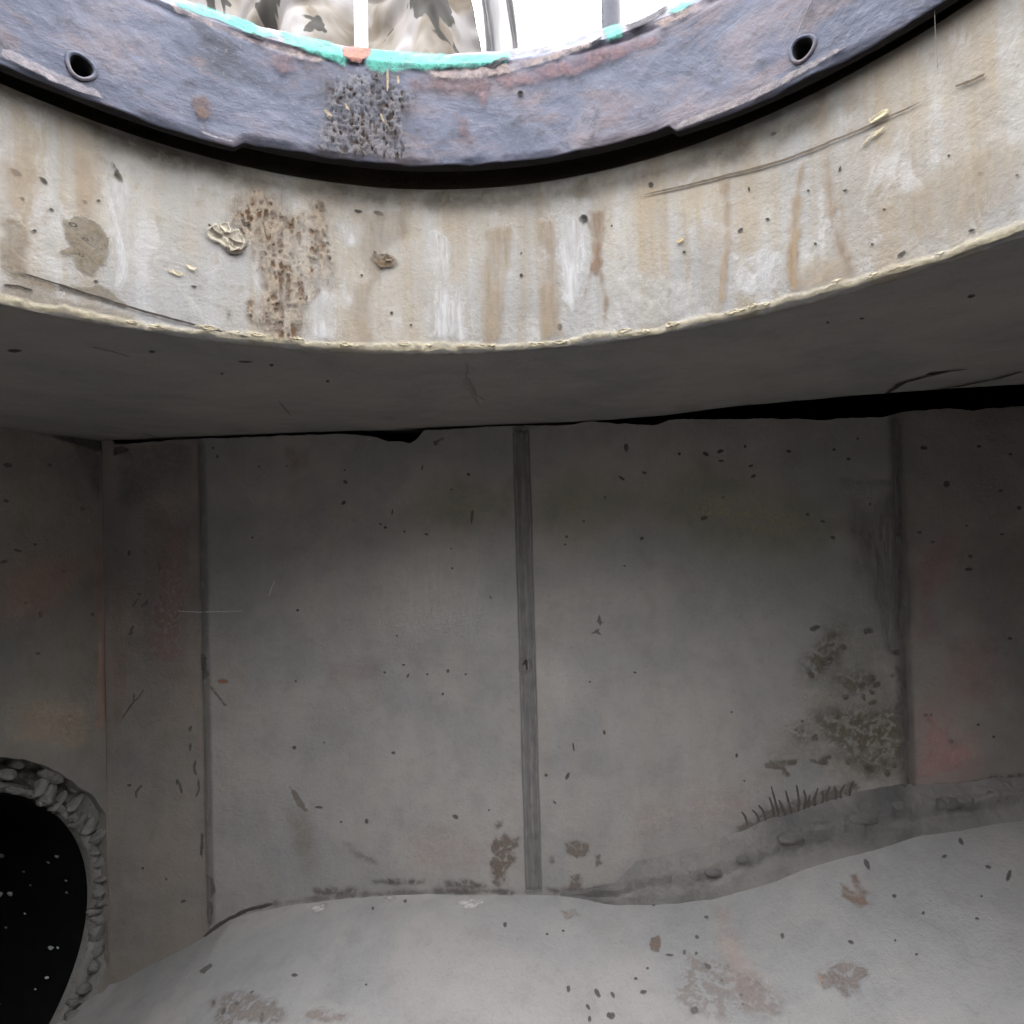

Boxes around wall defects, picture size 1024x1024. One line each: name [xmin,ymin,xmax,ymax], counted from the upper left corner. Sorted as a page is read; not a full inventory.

crack [955,73,985,87]
crack [644,102,920,195]
damp [1,215,135,321]
spalling [0,189,1024,352]
rust [588,211,604,279]
rust [787,196,800,289]
damp [808,625,847,678]
damp [795,668,909,777]
peeling [490,822,519,886]